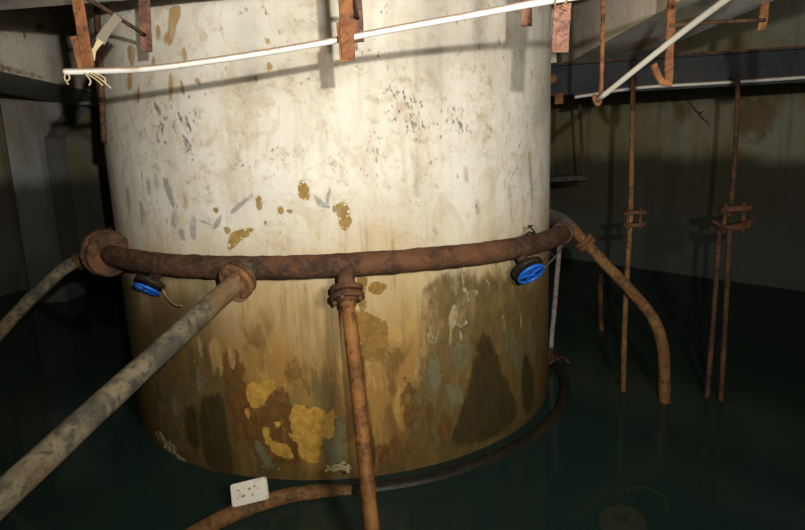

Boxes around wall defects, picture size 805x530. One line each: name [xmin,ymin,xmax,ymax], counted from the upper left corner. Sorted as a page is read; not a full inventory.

rust [156,6,180,45]
water stain [449,272,478,346]
water stain [186,394,232,474]
rust [148,338,299,473]
rust [369,272,539,467]
water stain [452,334,534,445]